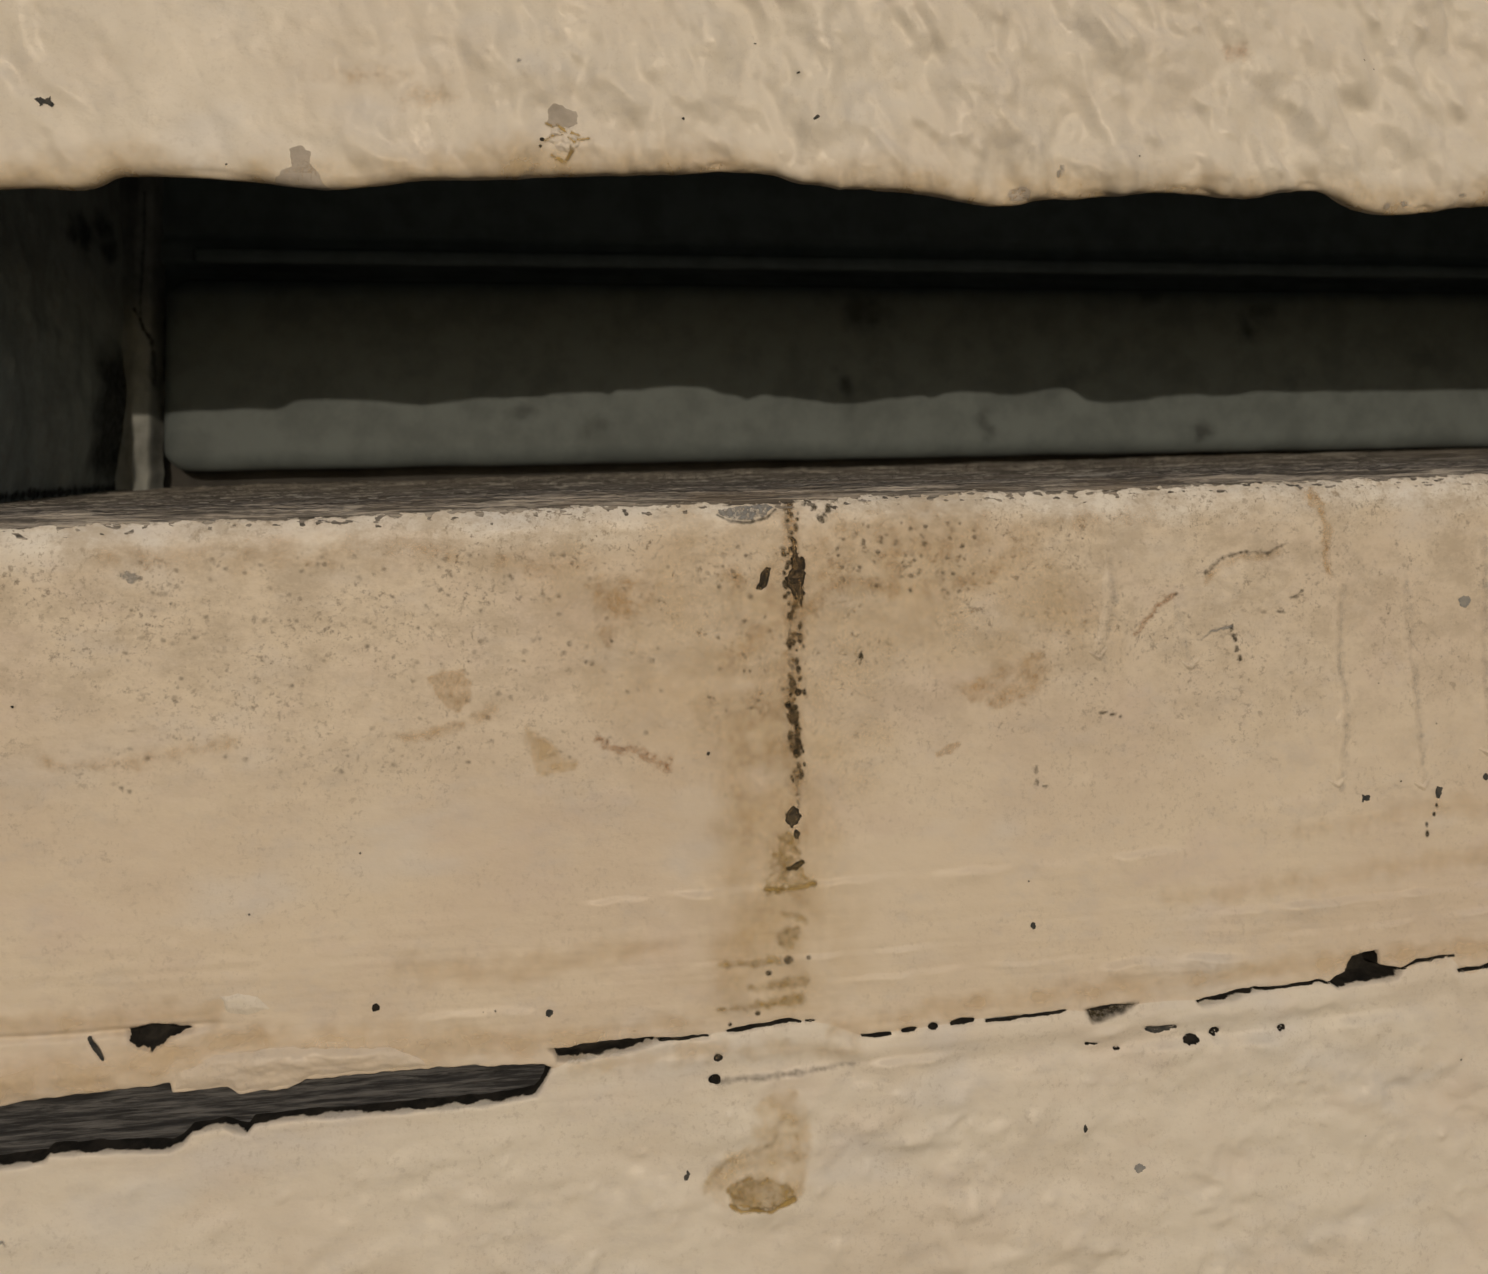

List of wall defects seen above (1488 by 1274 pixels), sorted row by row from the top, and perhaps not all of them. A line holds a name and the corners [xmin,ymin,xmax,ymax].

peeling [539,104,590,162]
damp [93,356,127,476]
crack [782,501,830,871]
damp [764,836,816,893]
crack [1196,950,1488,1003]
crack [861,1003,1135,1038]
damp [727,1177,796,1214]